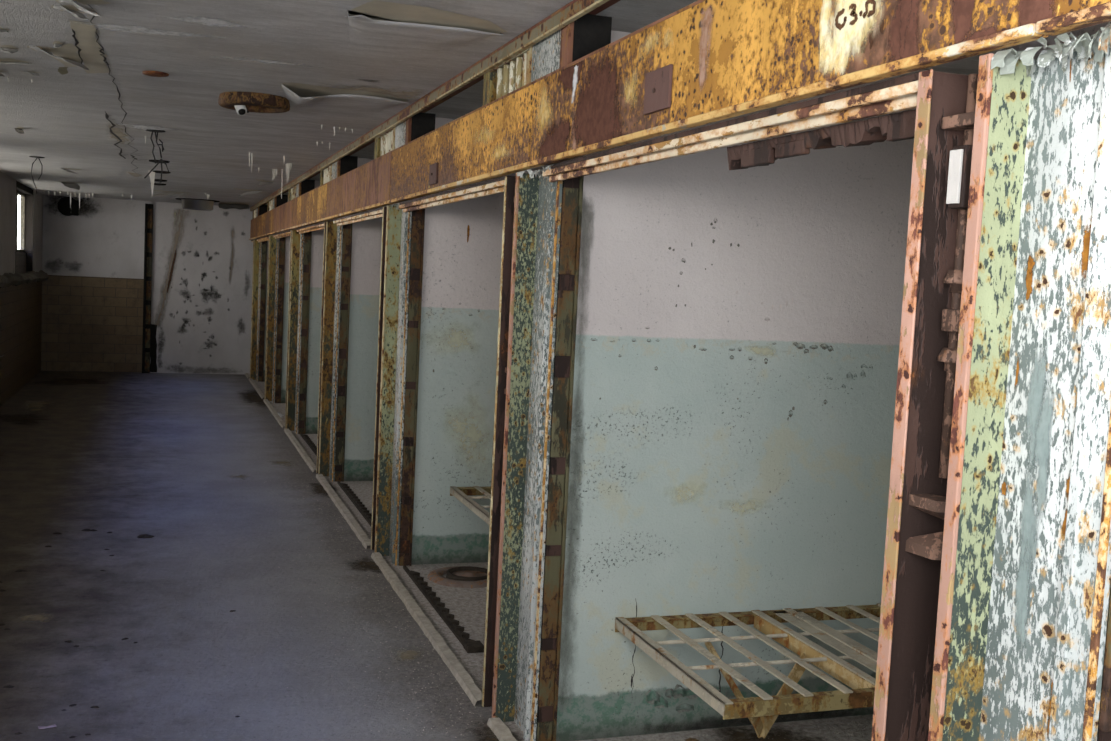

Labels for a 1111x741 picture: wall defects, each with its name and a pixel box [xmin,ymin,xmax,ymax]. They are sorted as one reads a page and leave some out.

peeling [0,0,110,77]
peeling [347,0,507,53]
corrosion [861,20,884,53]
peeling [888,0,921,62]
peeling [952,0,1057,44]
peeling [991,22,1111,77]
crack [72,4,141,171]
peeling [281,83,408,117]
corrosion [1081,208,1093,279]
leakage [155,209,245,373]